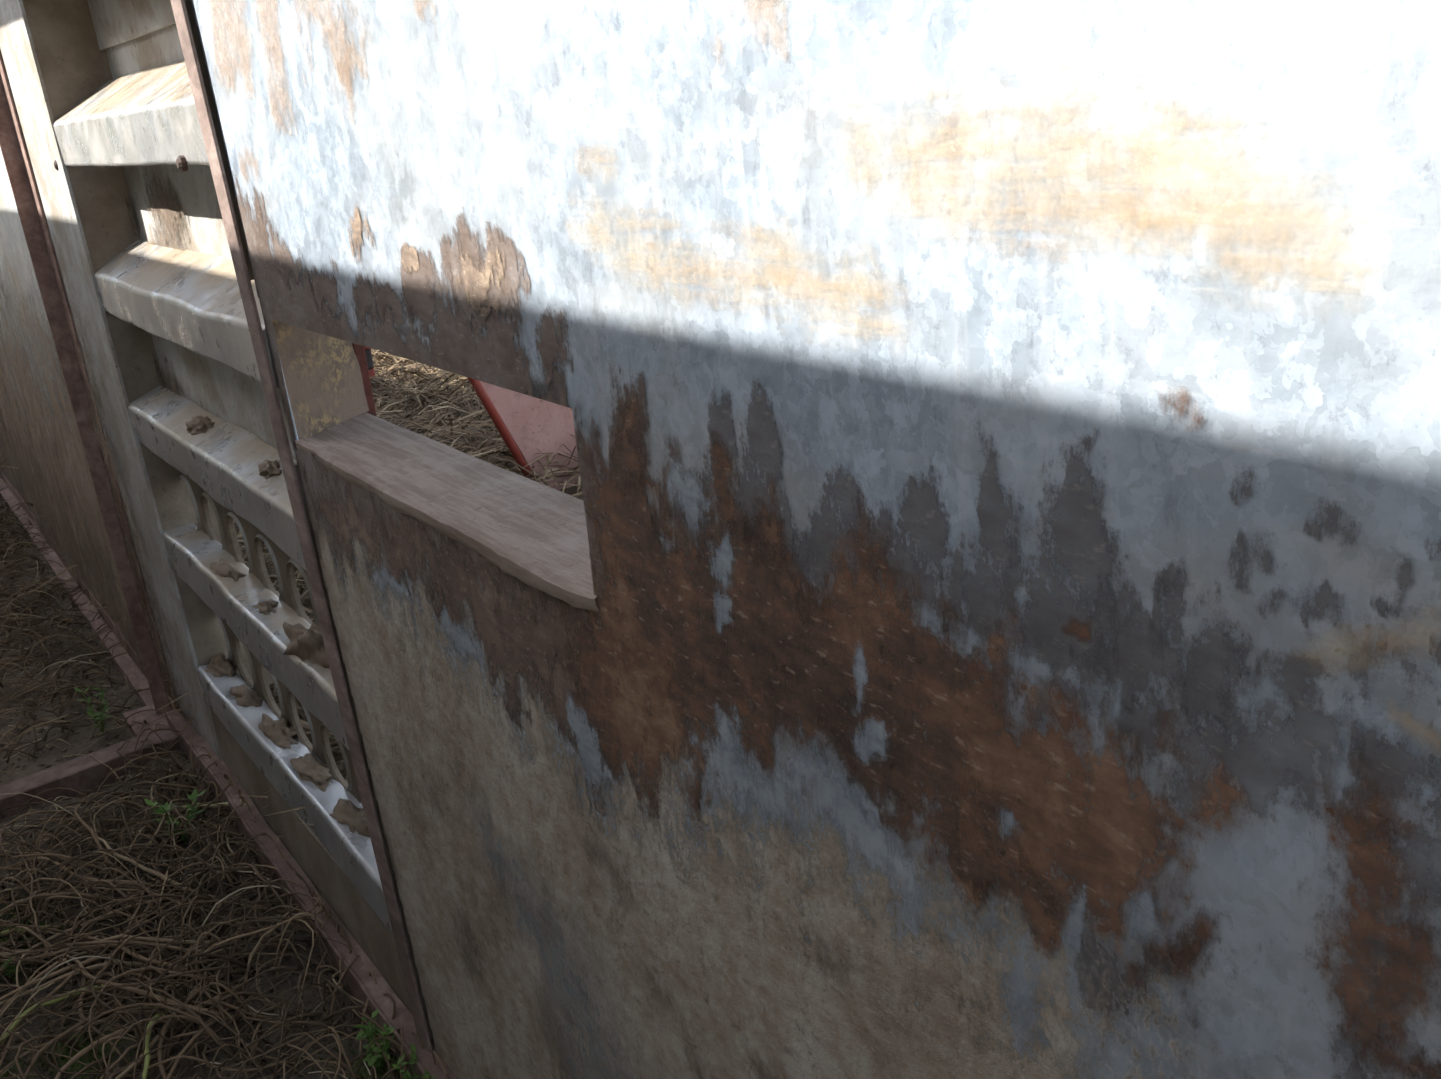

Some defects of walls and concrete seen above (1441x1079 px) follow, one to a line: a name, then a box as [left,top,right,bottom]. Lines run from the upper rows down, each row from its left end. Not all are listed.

rust [1304,504,1356,545]
rust [1229,531,1285,618]
rust [1300,579,1344,629]
rust [1370,557,1419,618]
rust [563,389,1246,993]
rust [1317,763,1441,1079]